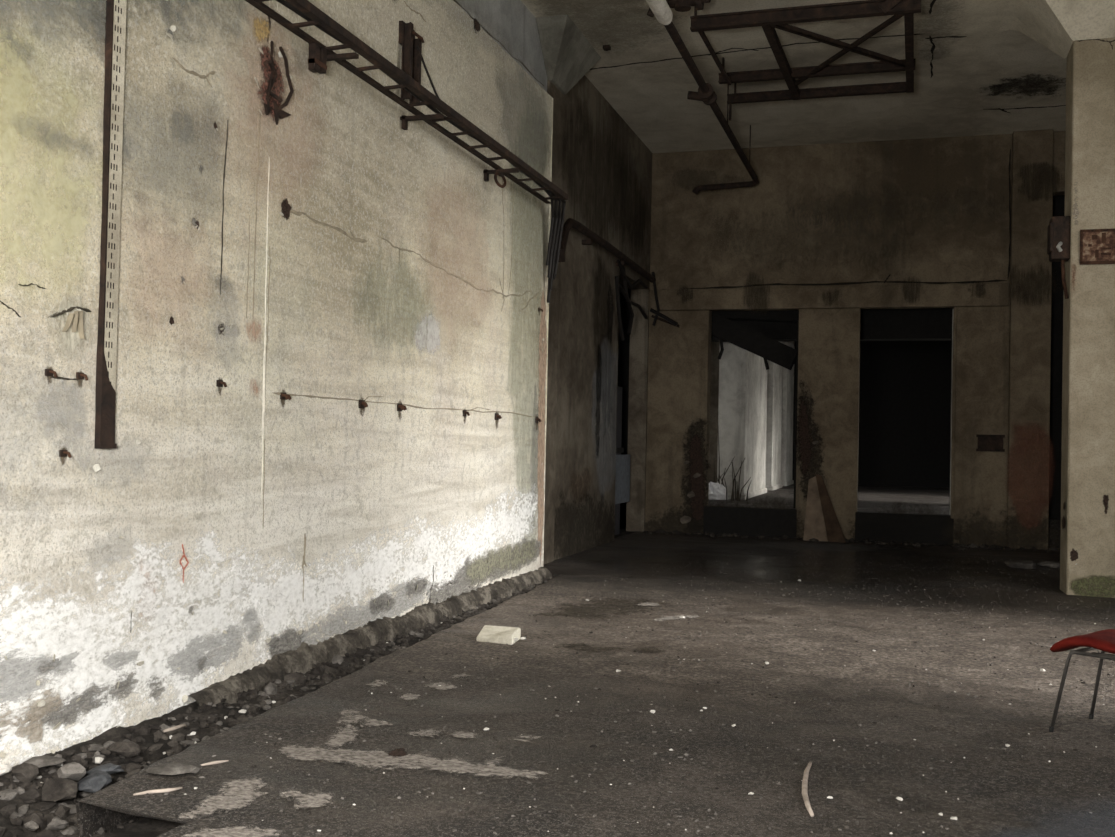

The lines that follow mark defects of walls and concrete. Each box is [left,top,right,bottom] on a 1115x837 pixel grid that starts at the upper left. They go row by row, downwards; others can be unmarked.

crack [590,0,967,77]
crack [0,283,57,318]
crack [220,113,539,527]
damp [0,485,538,767]